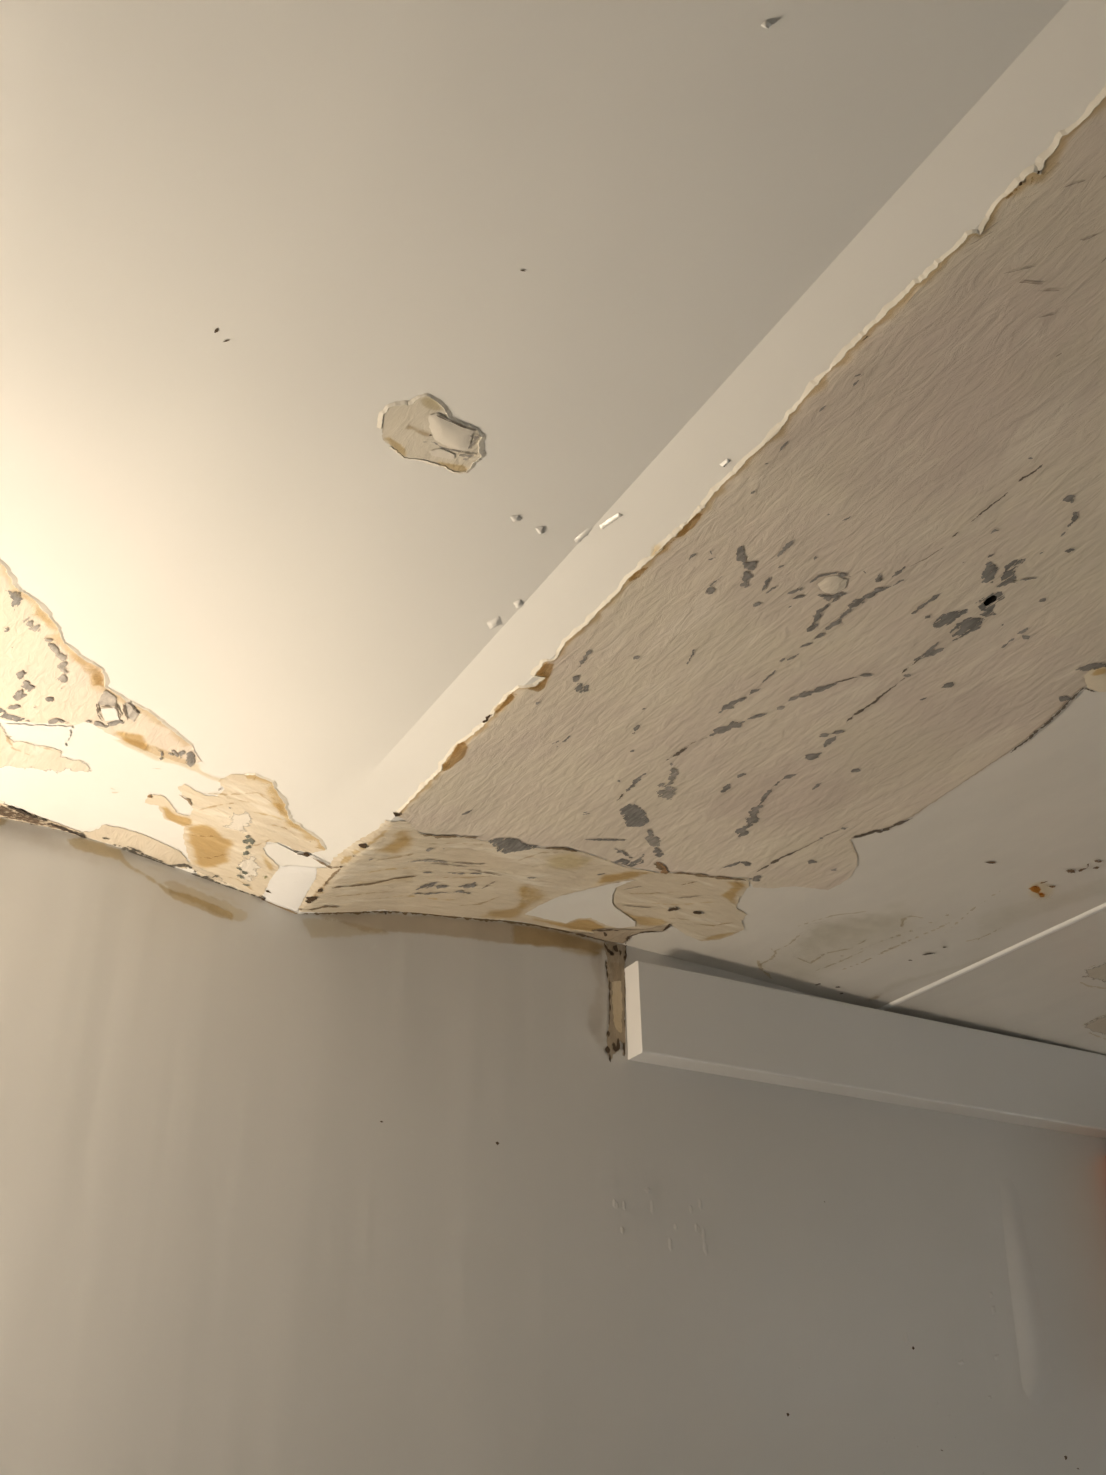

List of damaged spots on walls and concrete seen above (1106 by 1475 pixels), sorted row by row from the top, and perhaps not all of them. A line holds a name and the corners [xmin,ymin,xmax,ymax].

peeling [145,85,1106,941]
peeling [0,560,202,767]
water stain [0,806,261,899]